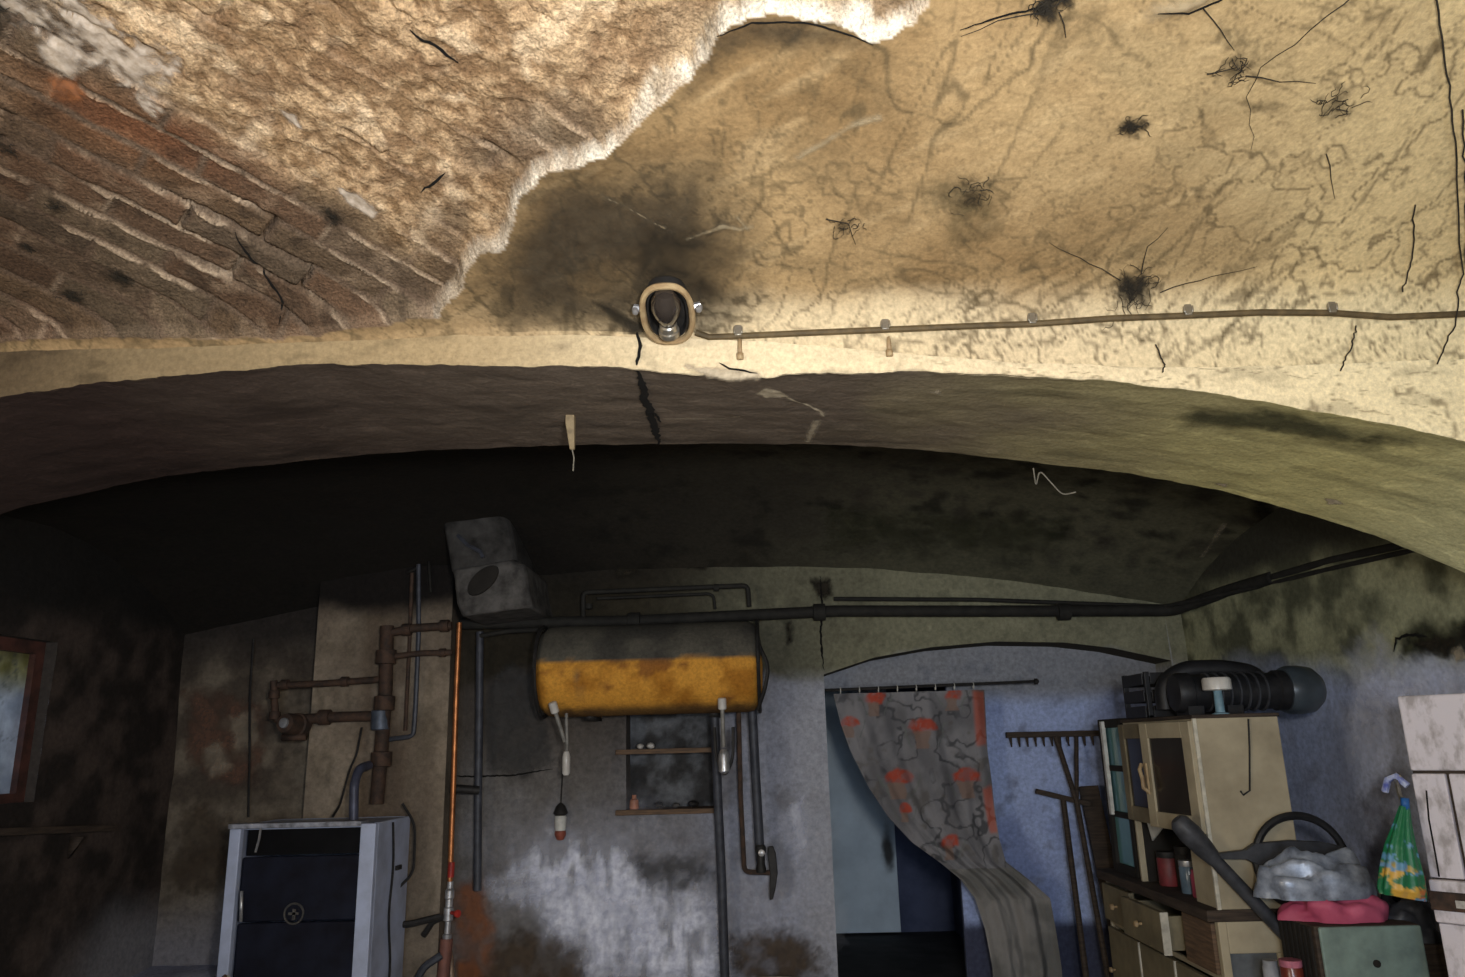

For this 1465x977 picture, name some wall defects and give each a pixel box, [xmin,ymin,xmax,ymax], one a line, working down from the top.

efflorescence [0,0,181,117]
crack [410,30,458,63]
crack [717,21,873,45]
crack [961,7,1036,30]
flaking render [0,0,928,342]
water stain [600,305,642,334]
crack [635,334,662,445]
water stain [1189,411,1380,443]
water stain [487,842,817,977]